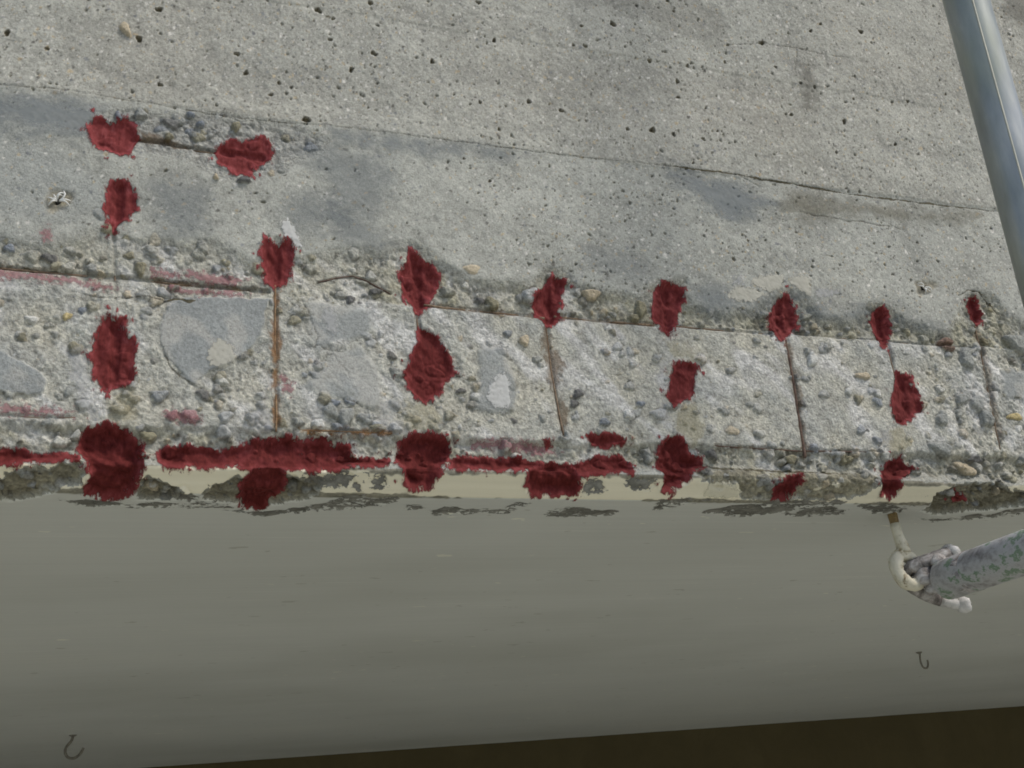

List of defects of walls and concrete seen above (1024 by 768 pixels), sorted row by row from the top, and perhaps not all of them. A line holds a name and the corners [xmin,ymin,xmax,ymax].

crack [655,164,991,226]
rust [271,321,281,423]
spalling [0,217,1024,523]
rust [307,428,392,437]